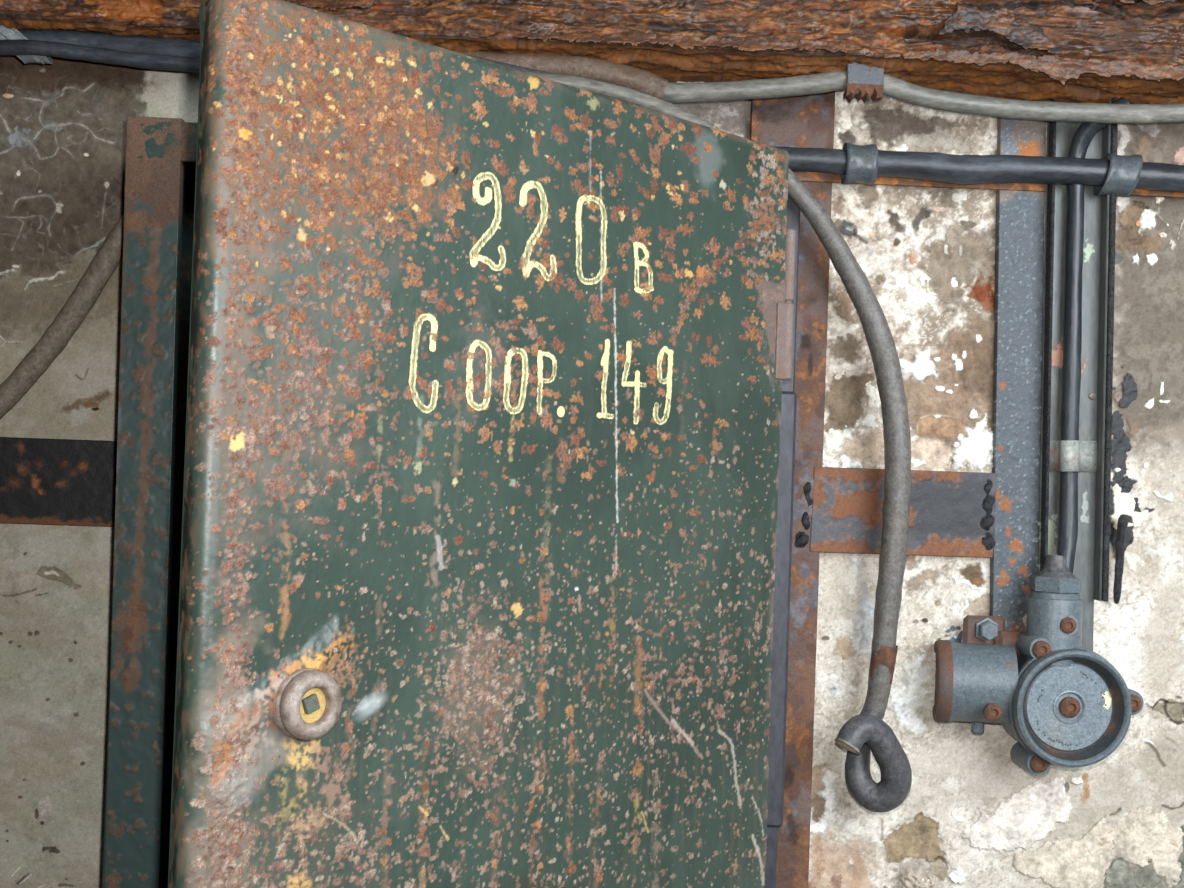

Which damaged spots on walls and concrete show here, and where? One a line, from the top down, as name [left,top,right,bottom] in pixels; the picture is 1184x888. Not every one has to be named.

spalling [1145,382,1170,409]
peeling [1126,538,1176,570]
spalling [882,812,968,888]
peeling [952,773,1184,888]